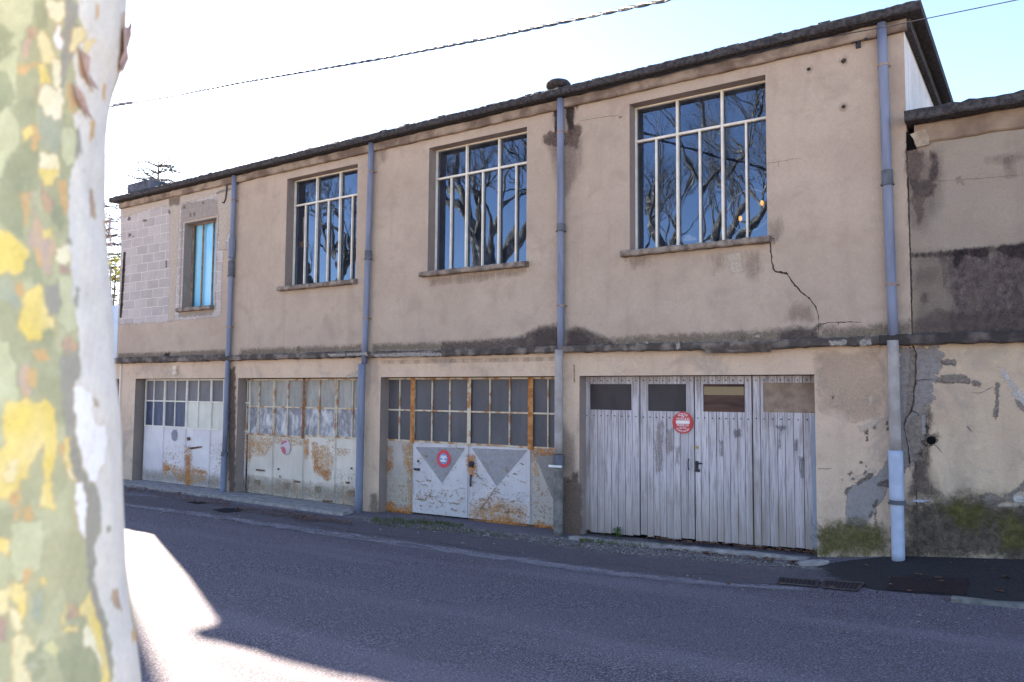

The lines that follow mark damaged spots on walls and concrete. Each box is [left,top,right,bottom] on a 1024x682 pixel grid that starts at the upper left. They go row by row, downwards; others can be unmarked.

damp [543,106,581,148]
damp [906,149,938,224]
damp [241,324,910,355]
crack [770,238,852,331]
spalling [937,359,981,386]
crack [904,144,1024,467]
damp [940,245,1024,332]
spalling [921,414,938,446]
peeling [844,460,889,528]
damp [905,412,1024,559]
peeling [982,481,1024,509]